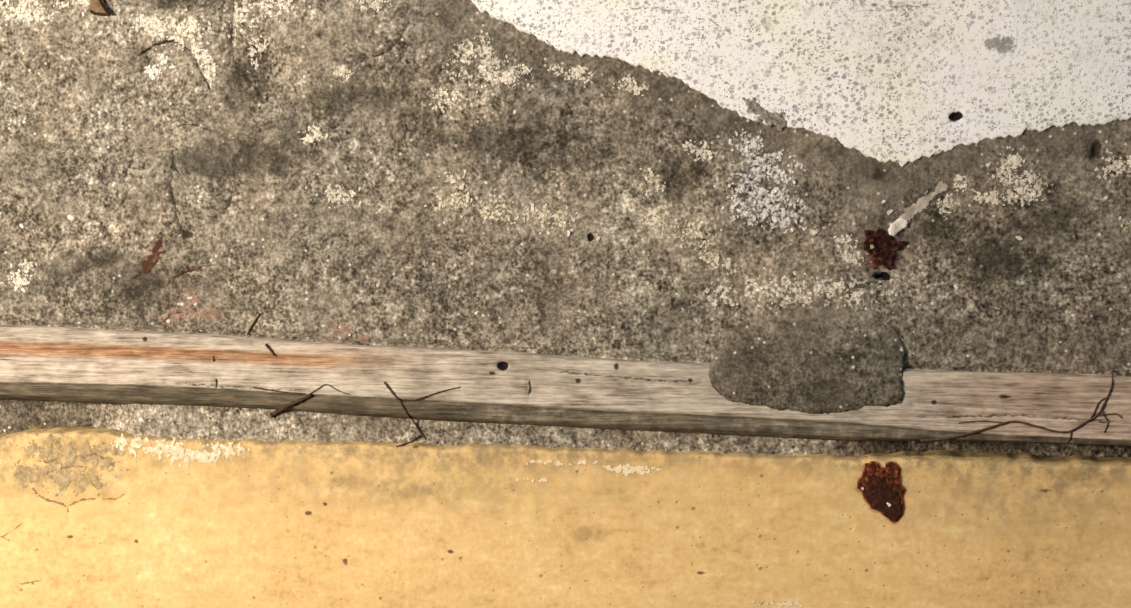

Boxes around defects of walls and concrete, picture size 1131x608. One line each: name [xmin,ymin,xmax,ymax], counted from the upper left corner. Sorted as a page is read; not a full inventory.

spalling [0,0,1131,377]
rust [863,229,908,270]
spalling [0,399,1131,503]
rust [857,461,905,523]